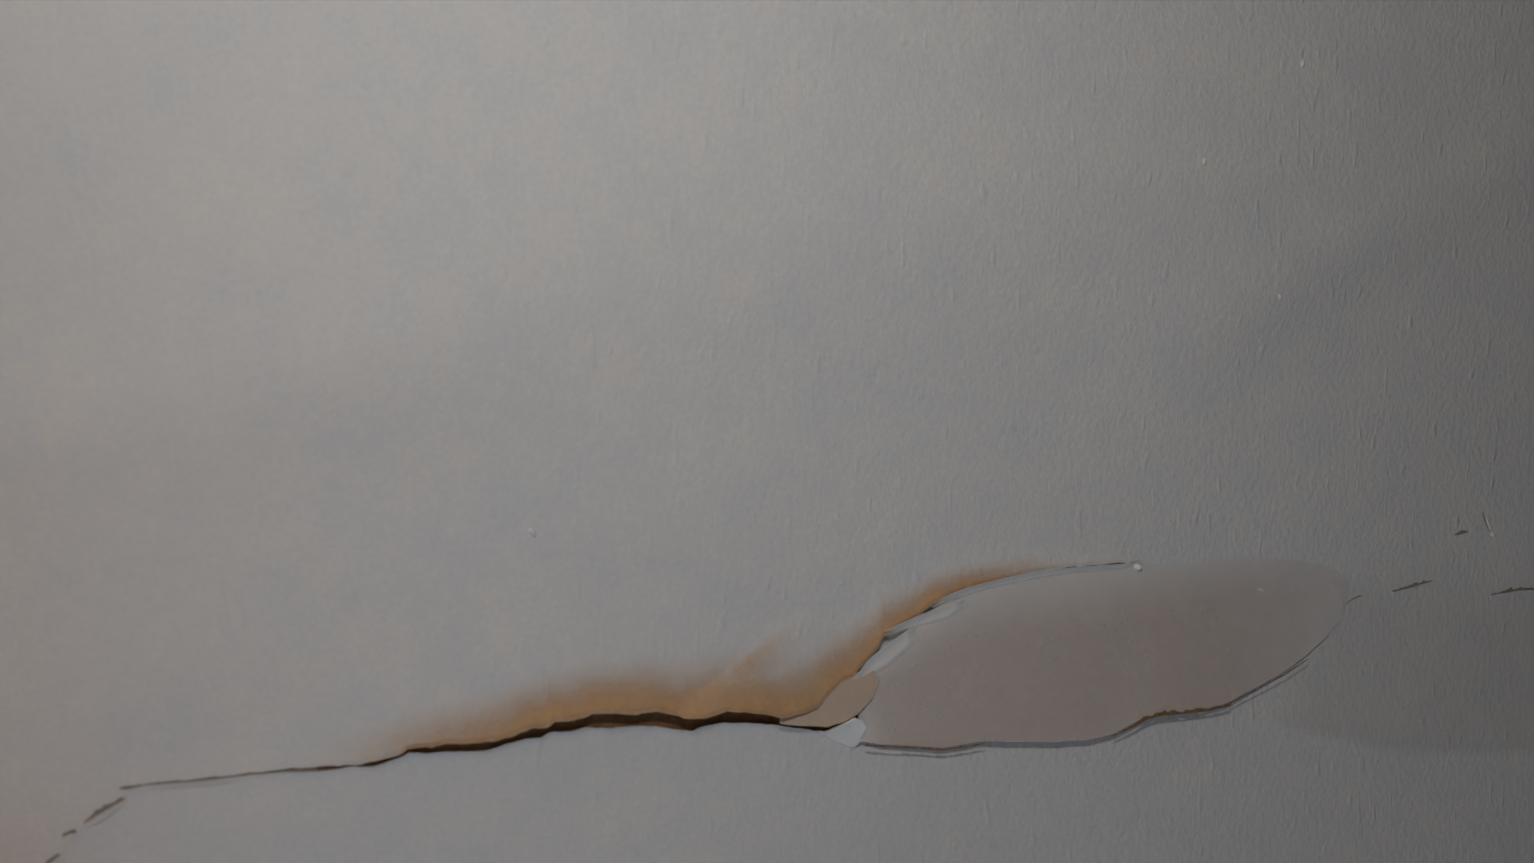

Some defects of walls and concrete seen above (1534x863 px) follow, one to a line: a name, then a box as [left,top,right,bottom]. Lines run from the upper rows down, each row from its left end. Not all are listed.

damp [463,574,1006,741]
peeling [779,559,1349,751]
crack [1347,580,1433,608]
crack [1490,587,1534,601]
crack [46,711,900,863]